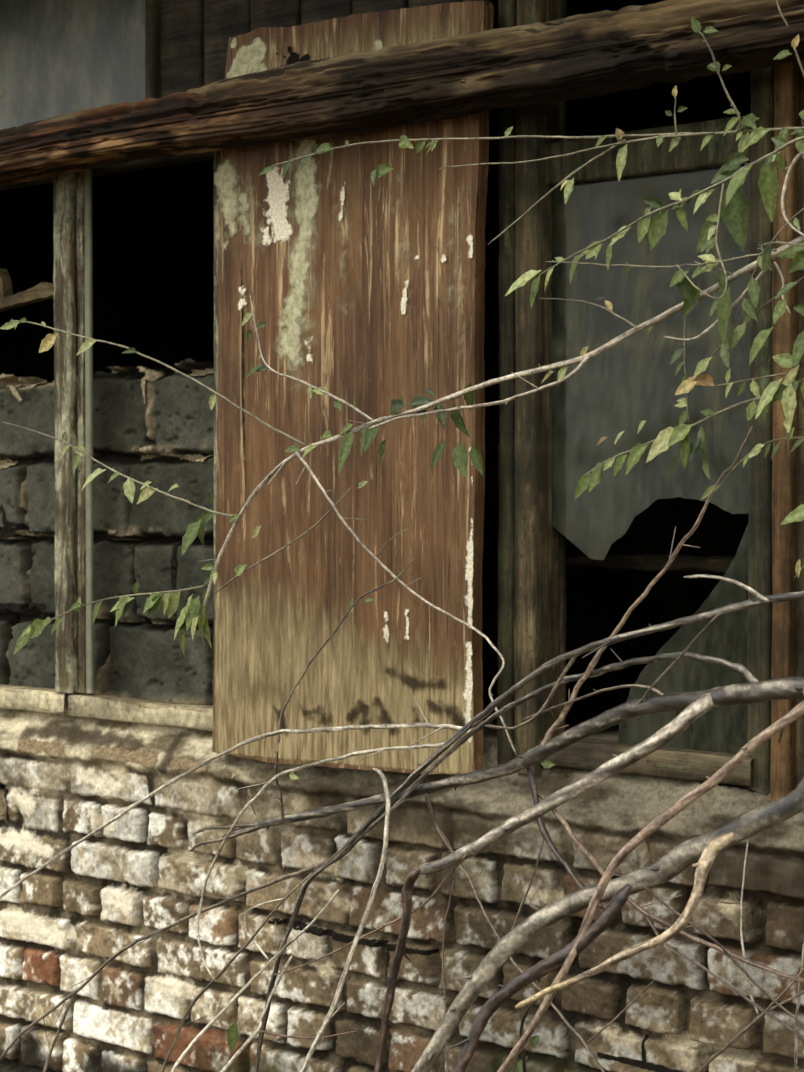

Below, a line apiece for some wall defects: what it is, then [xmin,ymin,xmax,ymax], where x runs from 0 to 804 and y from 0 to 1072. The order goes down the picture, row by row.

peeling [226,37,283,78]
peeling [304,19,462,60]
peeling [214,139,320,367]
peeling [465,518,473,628]
water stain [22,725,143,748]
water stain [157,736,180,773]
water stain [215,590,473,774]
peeling [462,642,473,743]
water stain [281,777,491,907]
water stain [687,850,804,960]
water stain [0,1021,63,1072]
water stain [82,1047,148,1072]